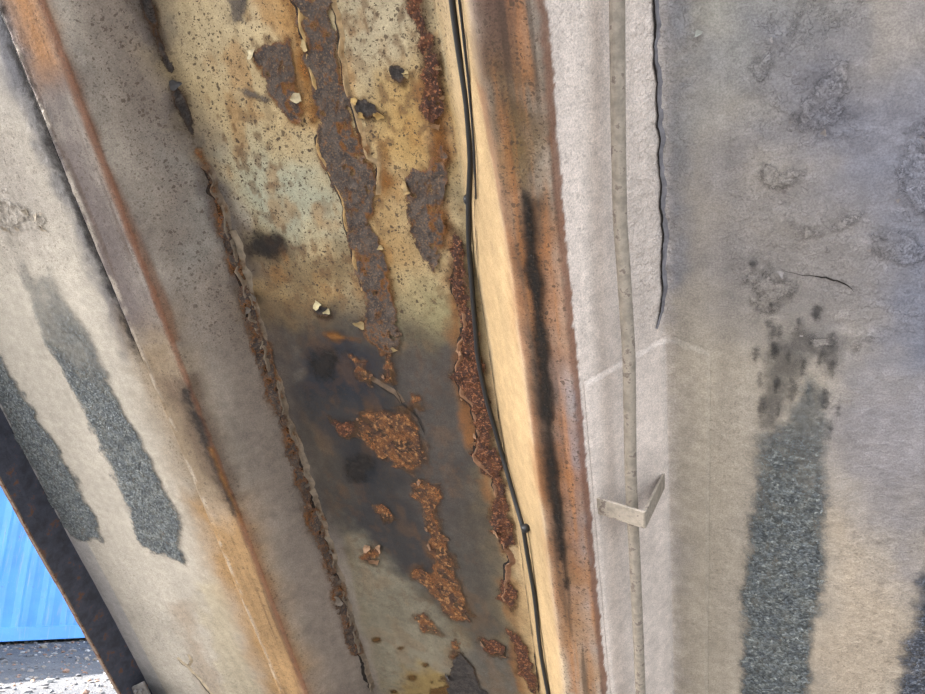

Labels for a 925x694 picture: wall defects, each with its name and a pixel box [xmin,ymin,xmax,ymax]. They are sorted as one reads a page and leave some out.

rust [405,0,445,147]
crack [653,0,669,329]
rust [447,227,518,612]
rust [331,393,475,623]
rust [414,612,442,636]
peeling [441,652,488,694]
rust [478,628,538,694]